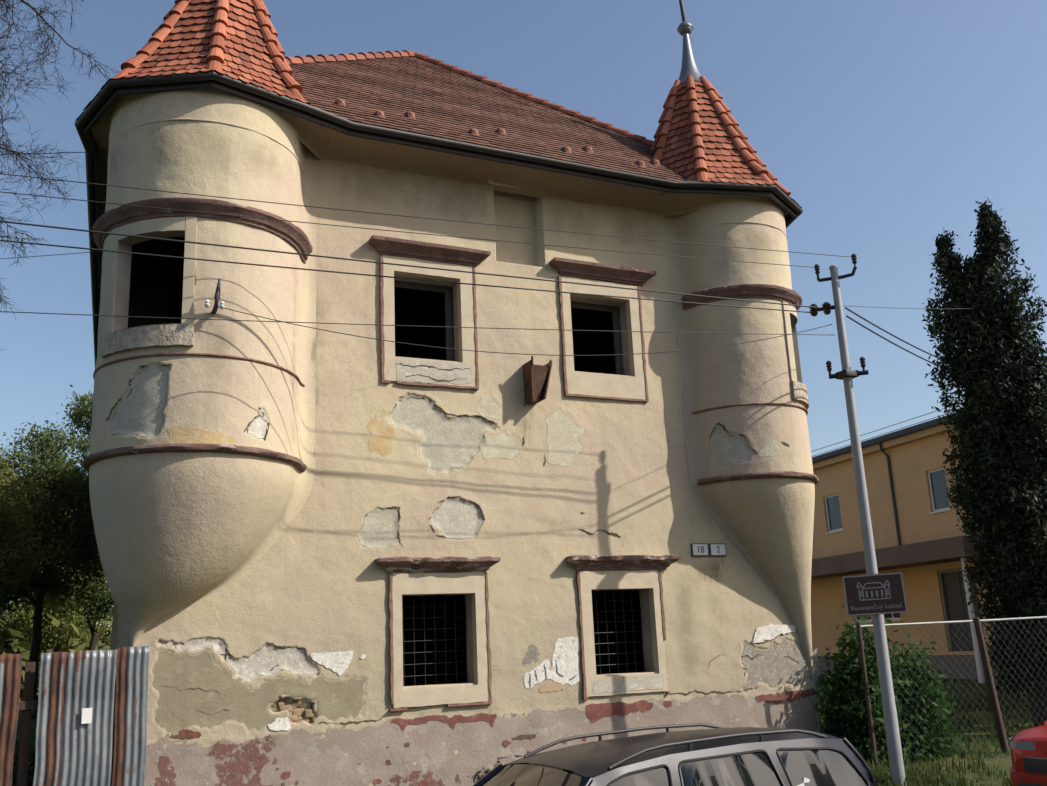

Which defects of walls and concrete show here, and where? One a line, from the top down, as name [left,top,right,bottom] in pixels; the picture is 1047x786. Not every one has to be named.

flaking render [106,364,170,437]
flaking render [244,407,270,440]
flaking render [388,393,500,474]
flaking render [429,496,485,539]
crack [579,512,621,537]
flaking render [750,623,796,644]
flaking render [166,637,366,683]
peeling [167,729,201,739]
peeling [209,698,317,786]
peeling [391,713,497,730]
peeling [155,756,177,786]
peeling [374,746,499,786]